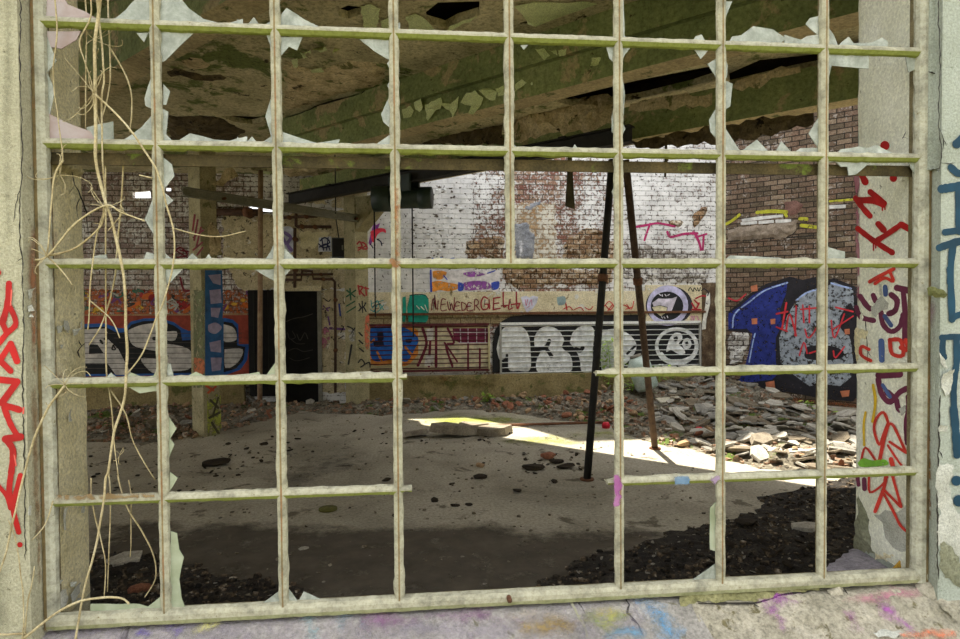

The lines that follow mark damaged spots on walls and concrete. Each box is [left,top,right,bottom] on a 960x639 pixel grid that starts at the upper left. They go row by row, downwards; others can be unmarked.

peeling [402,79,533,120]
spalling [422,94,613,146]
spalling [403,186,712,288]
crack [626,599,644,636]